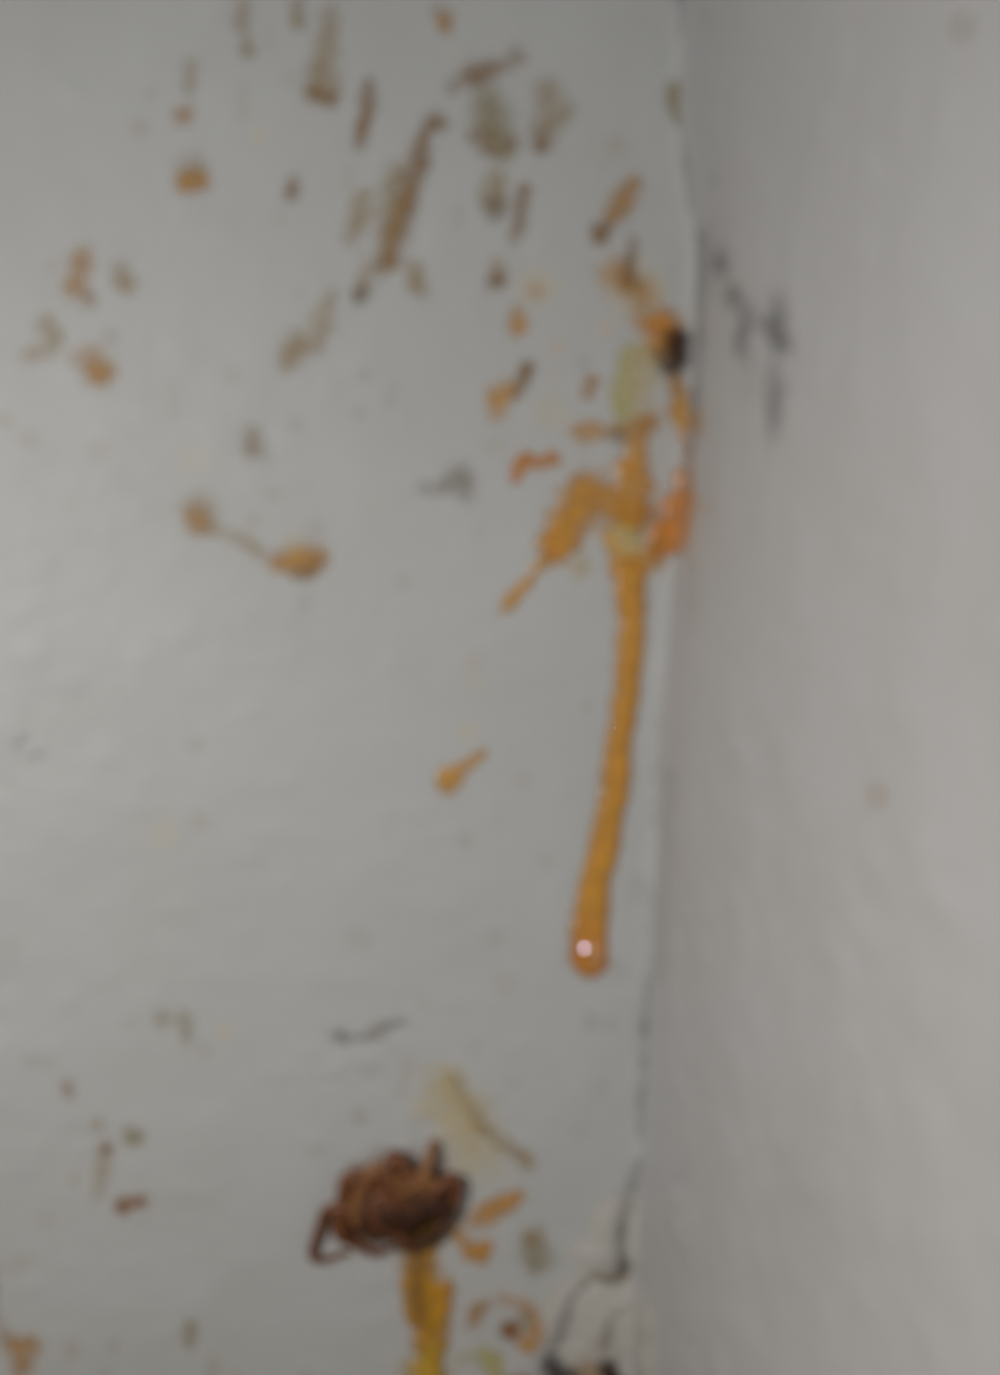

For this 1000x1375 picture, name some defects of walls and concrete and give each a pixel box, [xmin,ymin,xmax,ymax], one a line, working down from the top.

crack [596,1230,630,1282]